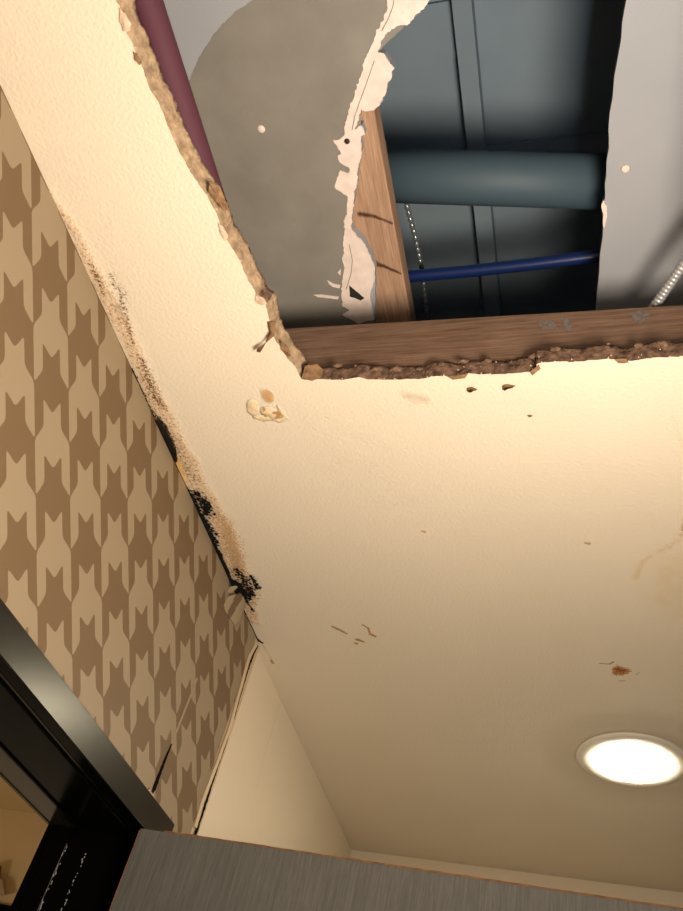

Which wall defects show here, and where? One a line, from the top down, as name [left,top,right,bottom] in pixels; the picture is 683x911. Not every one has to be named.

leakage [87,263,135,344]
flaking render [46,181,267,628]
leakage [132,358,262,640]
spalling [116,0,683,381]
crack [192,638,275,835]